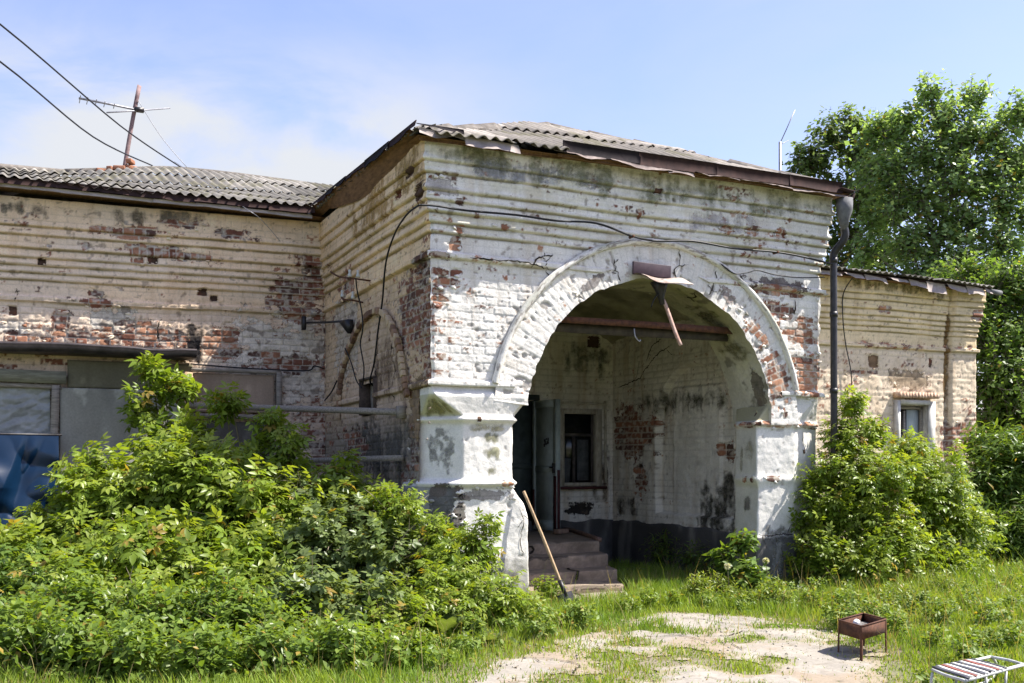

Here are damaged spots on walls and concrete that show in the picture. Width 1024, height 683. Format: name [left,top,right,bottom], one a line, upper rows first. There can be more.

damp [473,148,611,196]
flaking render [81,219,260,266]
crack [470,253,553,276]
peeling [0,254,363,414]
flaking render [397,224,466,449]
flaking render [717,274,828,430]
peeling [845,340,974,392]
mould [428,429,454,474]
flaking render [614,400,666,502]
damp [701,442,752,532]